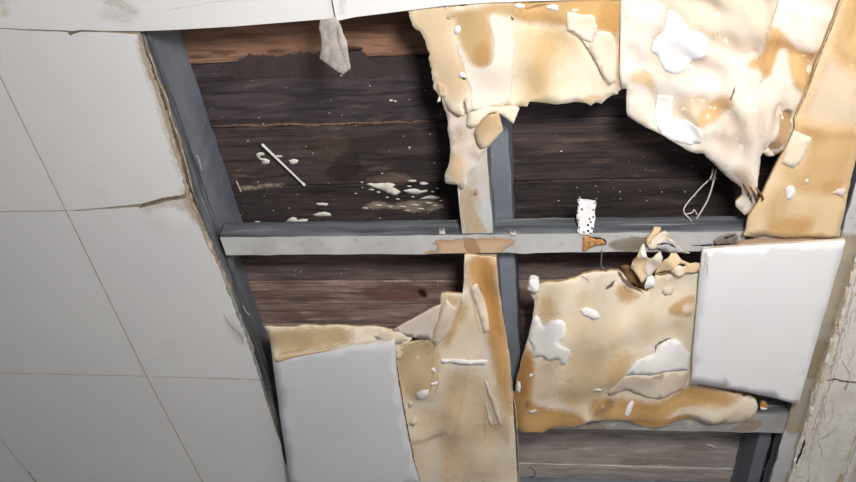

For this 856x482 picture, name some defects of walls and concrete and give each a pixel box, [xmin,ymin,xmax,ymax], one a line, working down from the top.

leakage [218,0,620,98]
peeling [458,15,515,109]
peeling [515,1,618,85]
leakage [662,0,815,91]
peeling [655,95,703,145]
leakage [763,108,792,157]
peeling [360,174,443,213]
leakage [399,343,437,398]
peeling [529,315,571,365]
leakage [427,190,733,433]
peeling [593,339,691,417]
crack [822,360,856,391]